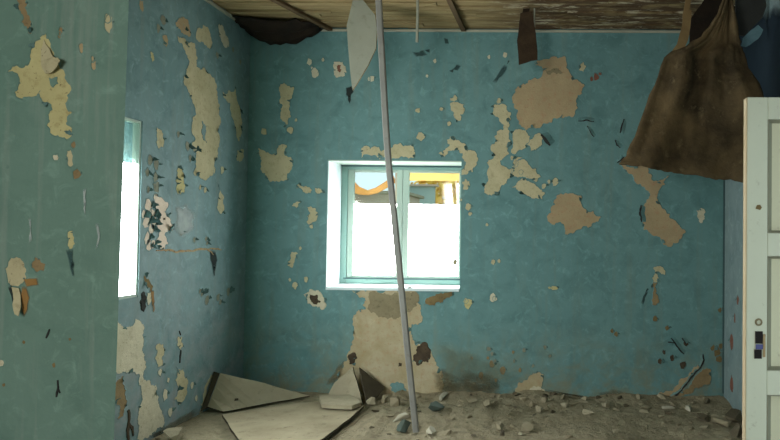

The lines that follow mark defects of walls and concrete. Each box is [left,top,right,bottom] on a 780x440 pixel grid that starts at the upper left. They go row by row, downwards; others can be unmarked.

peeling [7,0,84,181]
peeling [141,14,244,252]
peeling [278,82,298,135]
peeling [256,143,325,229]
peeling [437,56,602,236]
peeling [621,165,686,248]
peeling [4,255,47,316]
peeling [115,318,220,440]
flaking render [337,286,454,394]
flaking render [478,346,545,393]
flaking render [657,333,734,397]